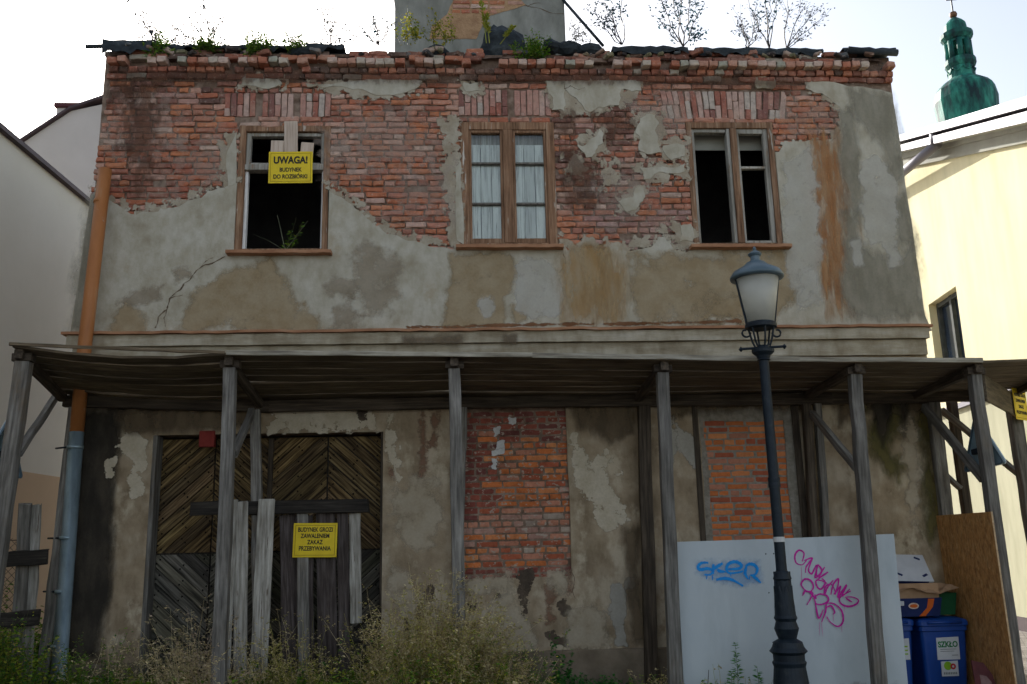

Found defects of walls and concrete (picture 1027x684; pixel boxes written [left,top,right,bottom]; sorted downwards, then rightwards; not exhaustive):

flaking render [430,0,525,39]
flaking render [88,72,843,307]
rust [810,129,849,310]
crack [155,256,225,328]
peeling [515,257,564,319]
peeling [104,432,149,499]
water stain [68,408,222,665]
water stain [544,570,574,625]